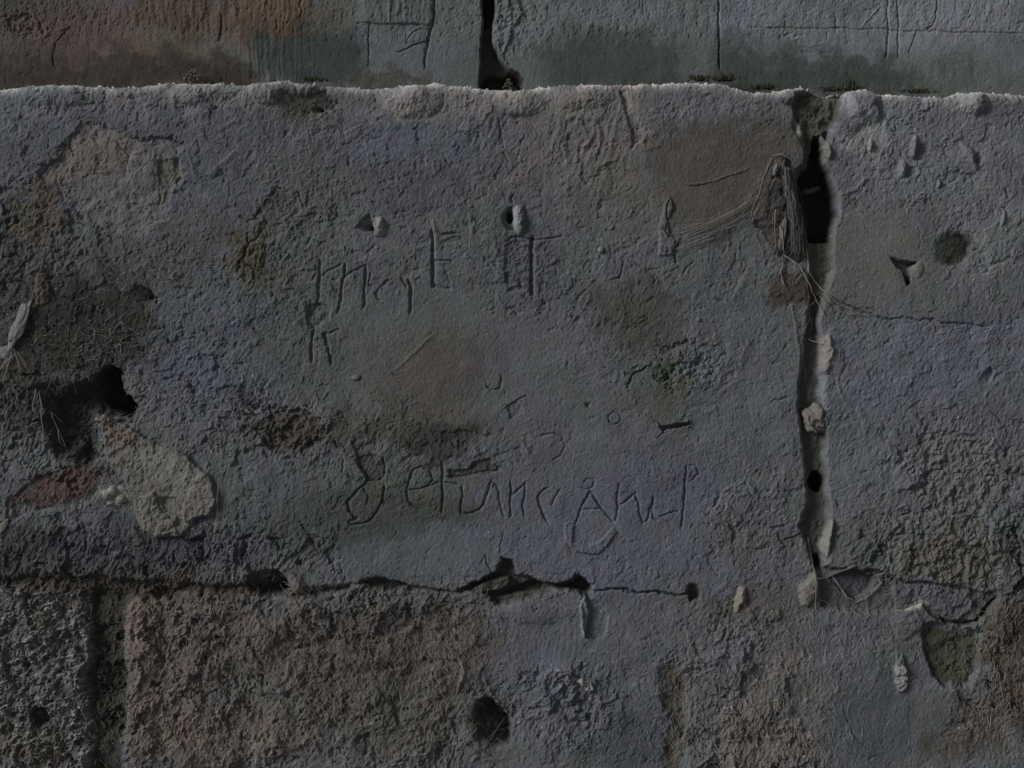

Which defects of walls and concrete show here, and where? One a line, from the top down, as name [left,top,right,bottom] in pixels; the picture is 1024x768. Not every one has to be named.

flaking render [5,361,222,539]
spalling [921,621,983,690]